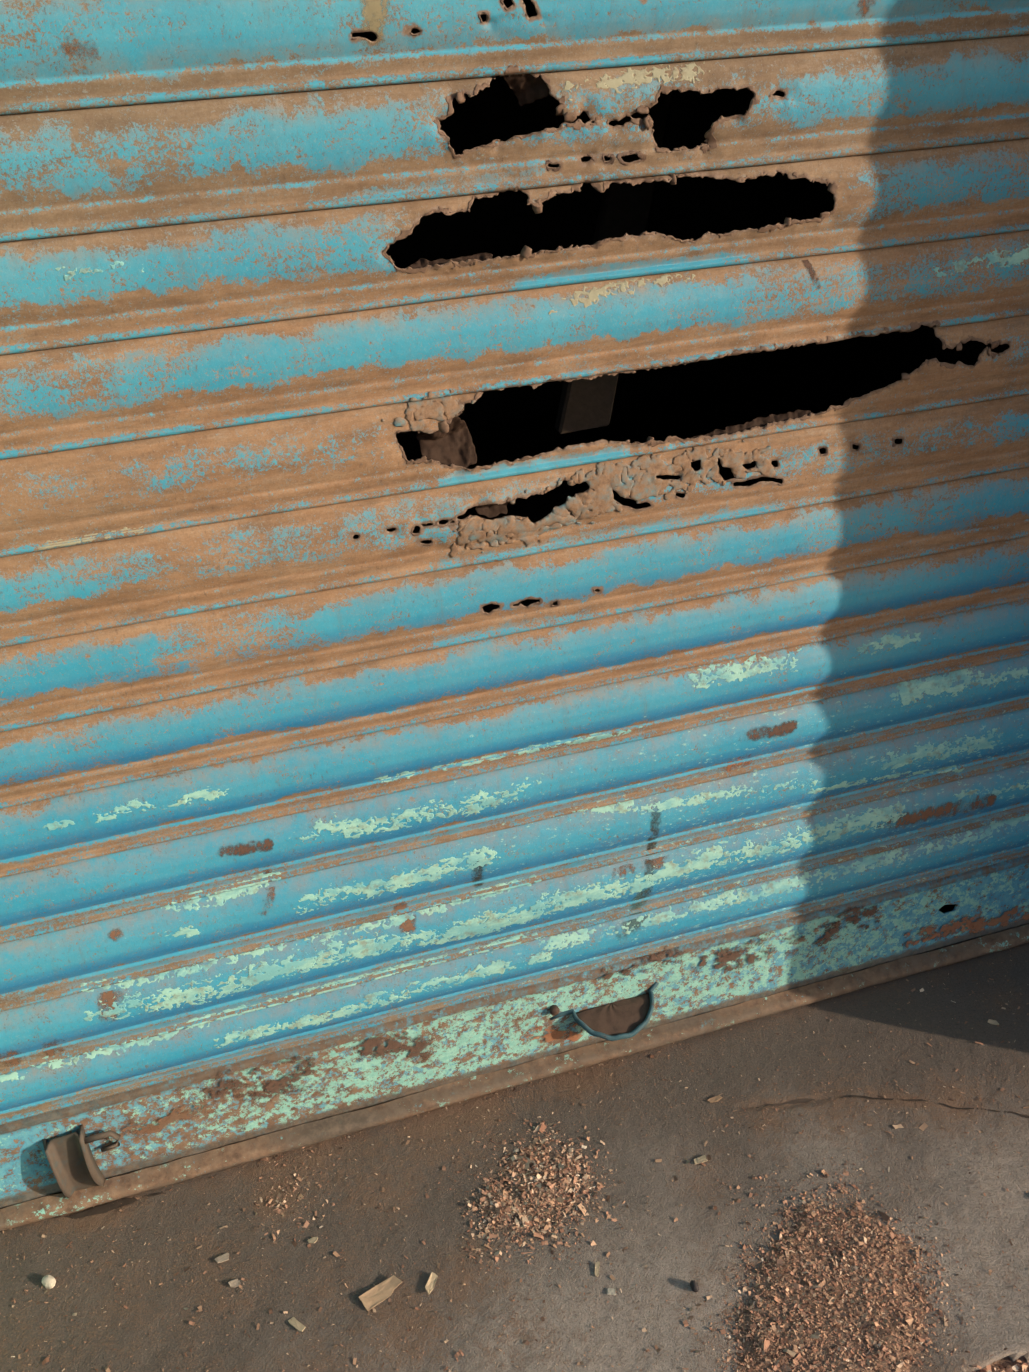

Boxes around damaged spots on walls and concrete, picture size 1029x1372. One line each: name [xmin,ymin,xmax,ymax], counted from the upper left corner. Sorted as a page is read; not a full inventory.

peeling [503,61,711,115]
rust [382,389,476,431]
peeling [416,417,477,468]
peeling [692,410,811,438]
rust [449,439,776,558]
peeling [553,728,1004,821]
peeling [293,773,544,842]
rust [887,794,997,828]
peeling [0,801,1029,1082]
rust [356,1032,434,1063]
rust [107,1056,319,1144]
crack [756,1095,1029,1118]